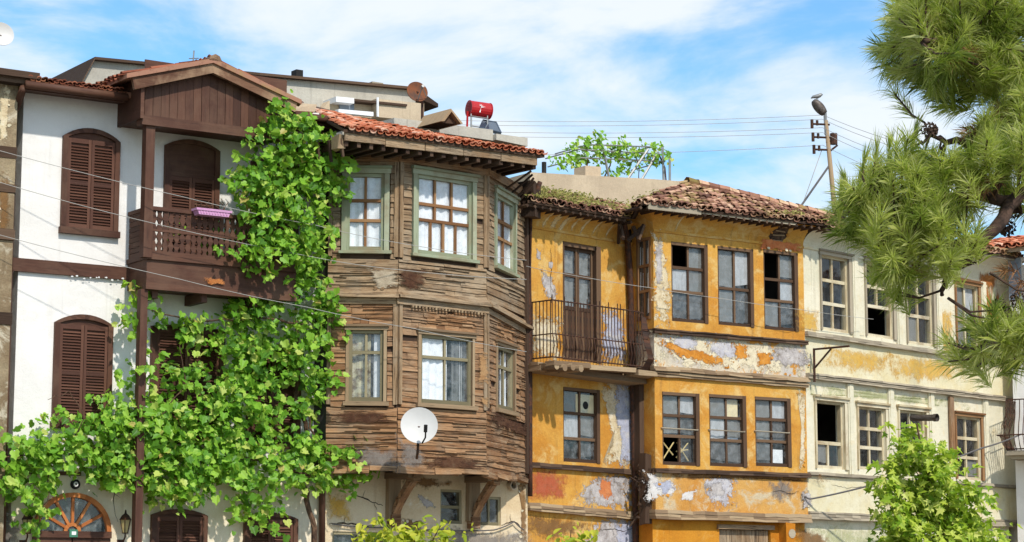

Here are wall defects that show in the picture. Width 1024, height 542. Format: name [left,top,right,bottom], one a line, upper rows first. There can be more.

peeling [536,248,558,302]
peeling [599,309,628,367]
peeling [644,229,813,469]
leakage [829,349,962,380]
peeling [573,383,738,542]